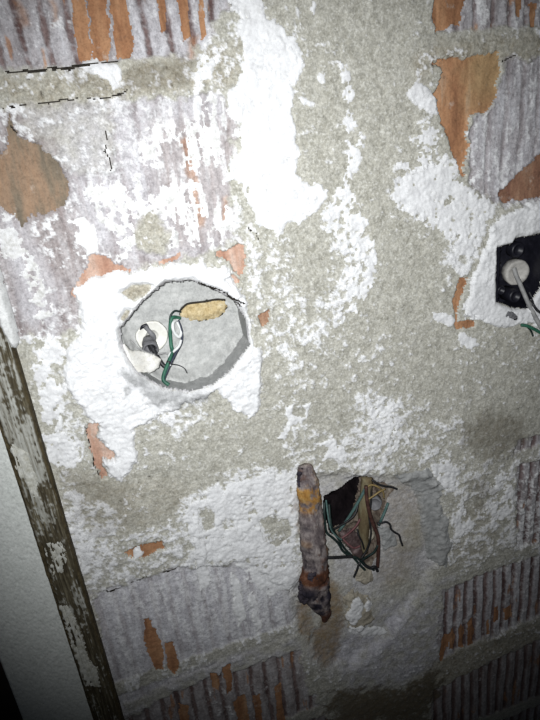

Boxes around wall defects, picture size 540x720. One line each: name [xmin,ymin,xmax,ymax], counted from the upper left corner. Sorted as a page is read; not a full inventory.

spalling [432,0,465,32]
crack [5,61,118,74]
flaking render [67,0,378,324]
flaking render [389,51,540,260]
spalling [0,113,69,324]
flaking render [432,277,480,352]
flaking render [0,269,115,479]
flaking render [431,459,460,494]
flaking render [451,498,475,538]
flaking render [479,472,517,529]
corrosion [297,572,320,607]
spalling [143,618,179,674]